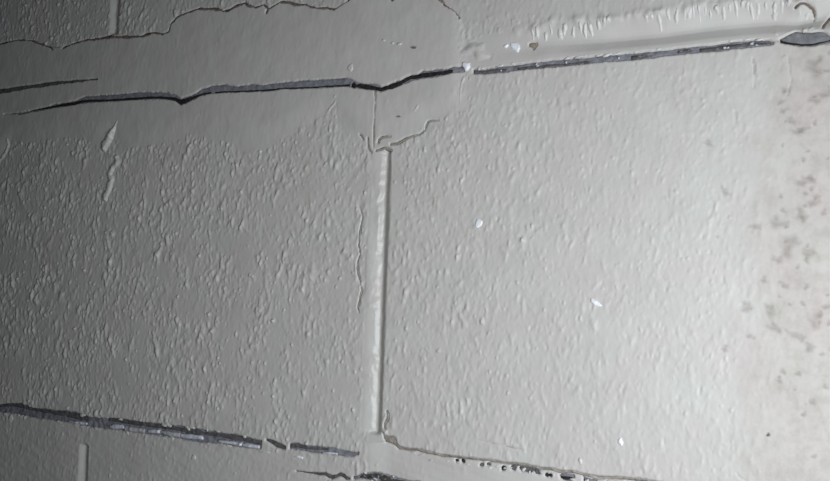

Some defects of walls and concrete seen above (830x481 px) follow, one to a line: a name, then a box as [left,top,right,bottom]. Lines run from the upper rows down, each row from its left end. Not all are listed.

crack [0,38,773,153]
crack [0,403,409,481]
crack [384,410,654,481]